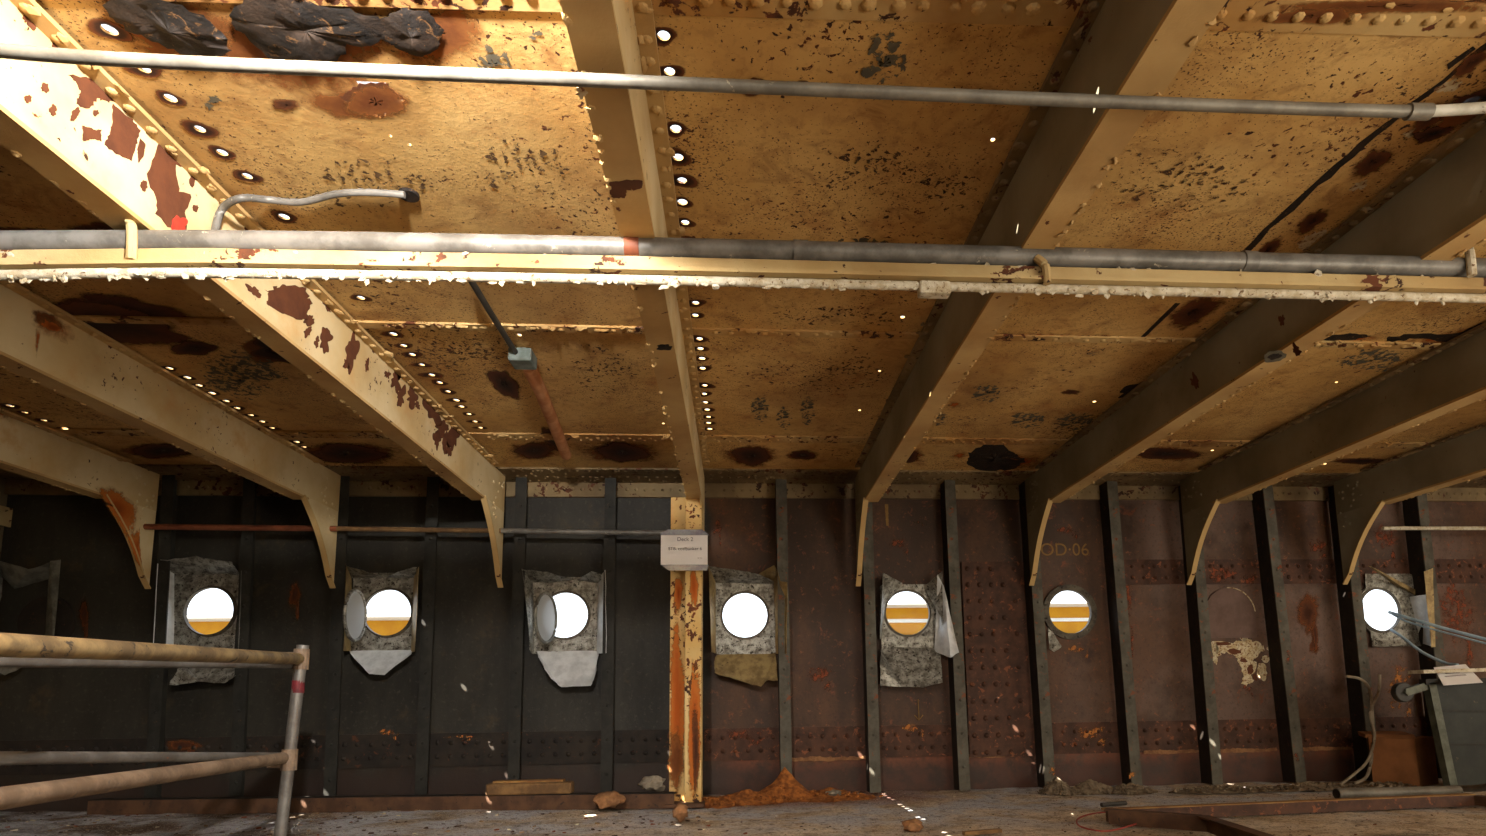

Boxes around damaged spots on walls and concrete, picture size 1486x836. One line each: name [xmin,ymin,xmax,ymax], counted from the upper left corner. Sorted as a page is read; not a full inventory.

corrosion [87,0,481,182]
peeling [24,74,199,230]
peeling [574,277,903,325]
peeling [1017,287,1164,299]
peeling [1314,269,1378,304]
peeling [0,270,467,456]
corrosion [588,442,658,463]
corrosion [726,445,816,467]
corrosion [954,445,1038,471]
corrosion [1297,594,1319,652]
corrosion [668,571,701,796]
peeling [1211,638,1270,686]